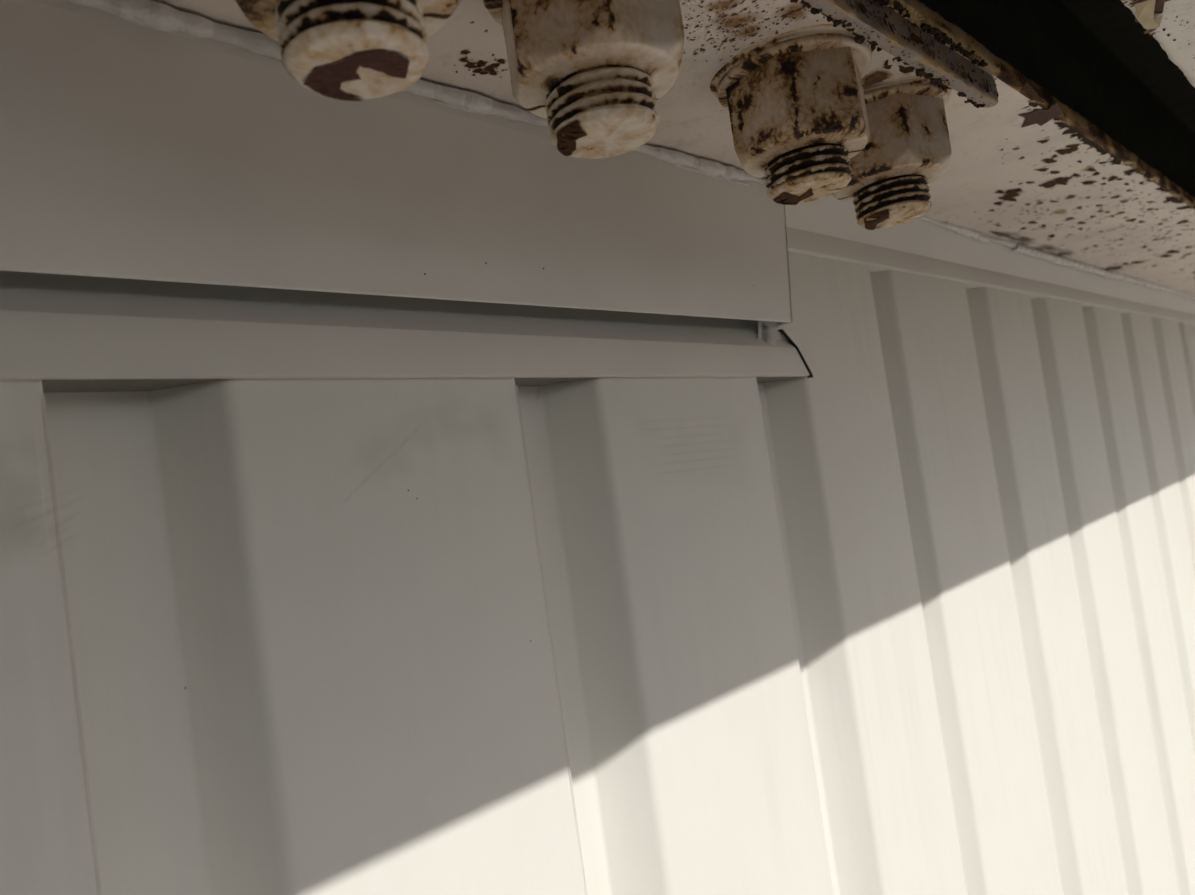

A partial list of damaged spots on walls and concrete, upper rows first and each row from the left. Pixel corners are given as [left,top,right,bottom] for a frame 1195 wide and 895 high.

peeling [1122,0,1170,37]
rust [454,50,507,78]
rust [682,0,999,109]